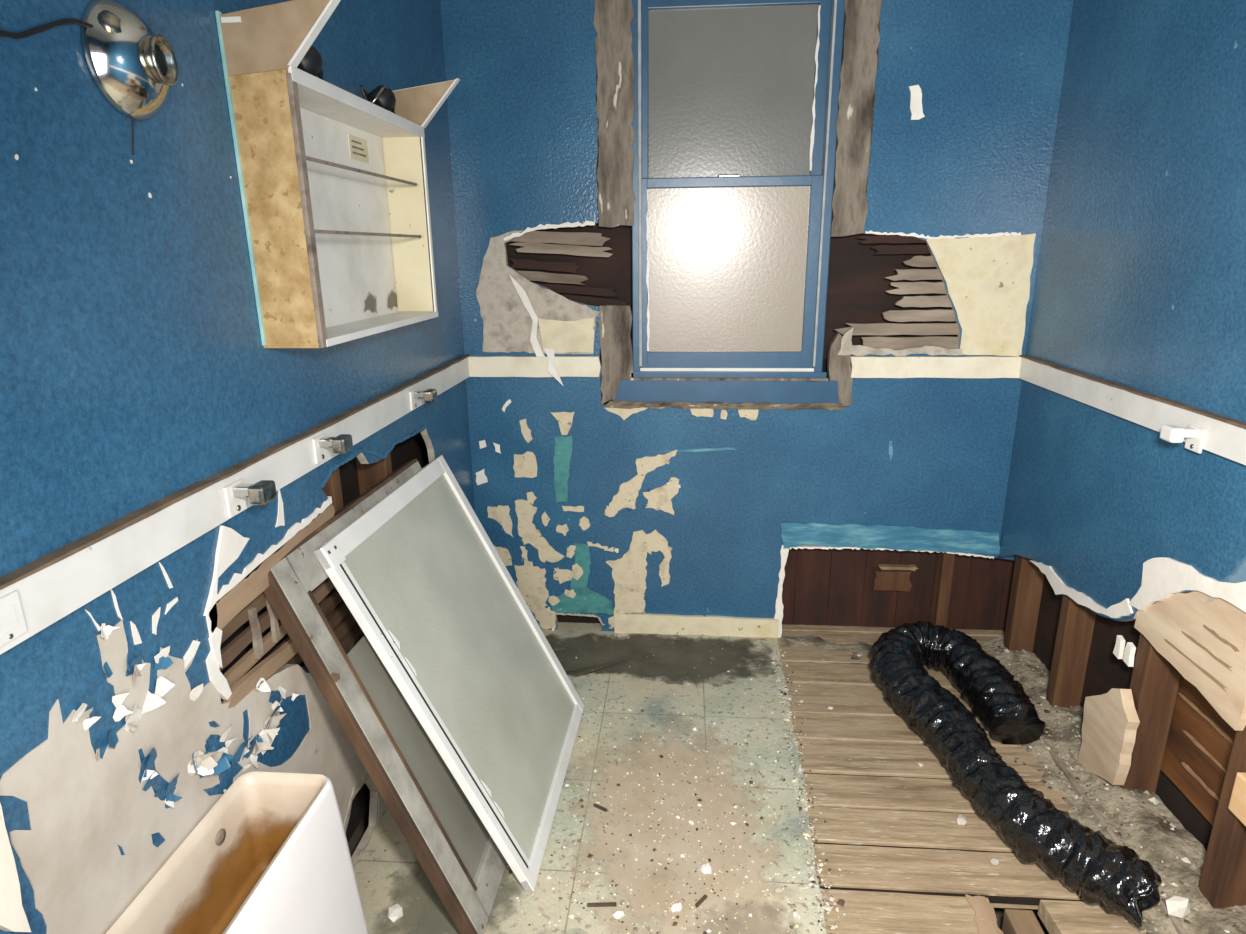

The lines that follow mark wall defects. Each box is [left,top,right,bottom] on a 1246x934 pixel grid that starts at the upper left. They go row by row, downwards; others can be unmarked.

peeling [809,5,821,171]
peeling [909,85,925,120]
spalling [476,189,650,386]
spalling [823,230,1036,359]
peeling [476,469,488,485]
peeling [479,419,681,631]
peeling [605,407,647,420]
peeling [690,408,759,420]
peeling [0,424,427,934]
spalling [774,522,1246,908]